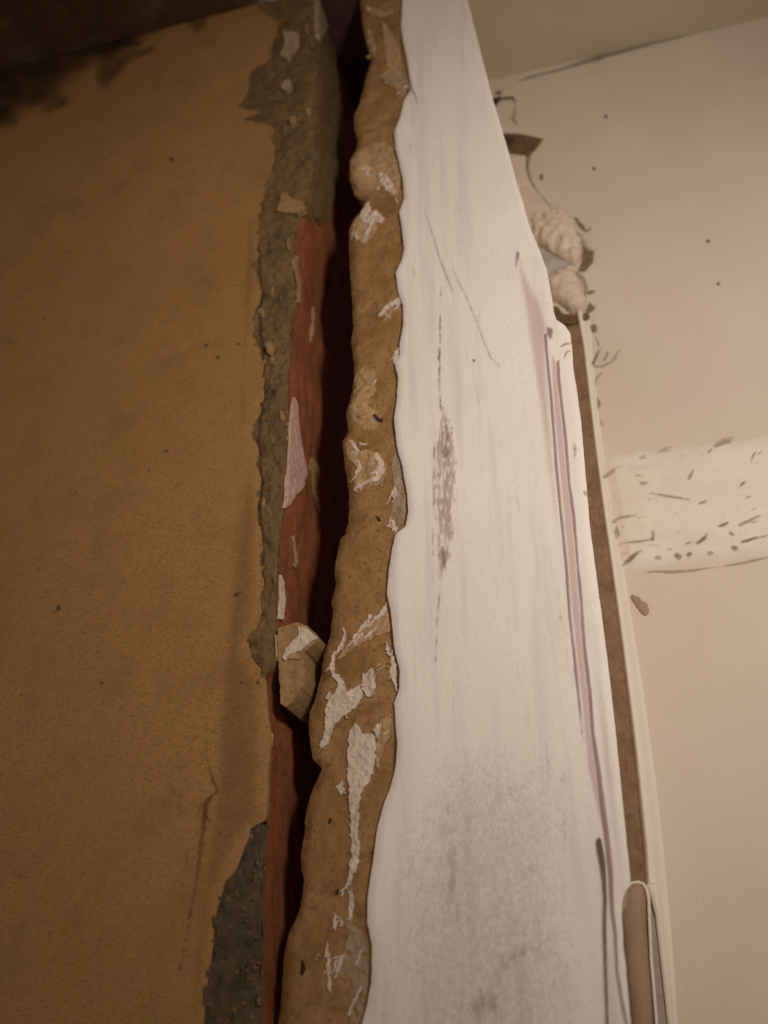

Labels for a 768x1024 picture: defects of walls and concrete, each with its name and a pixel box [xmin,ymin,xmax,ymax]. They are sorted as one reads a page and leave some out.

water stain [0,0,261,120]
spalling [493,91,543,156]
spalling [553,217,620,385]
flaking render [238,0,411,1024]
spalling [202,824,269,1024]